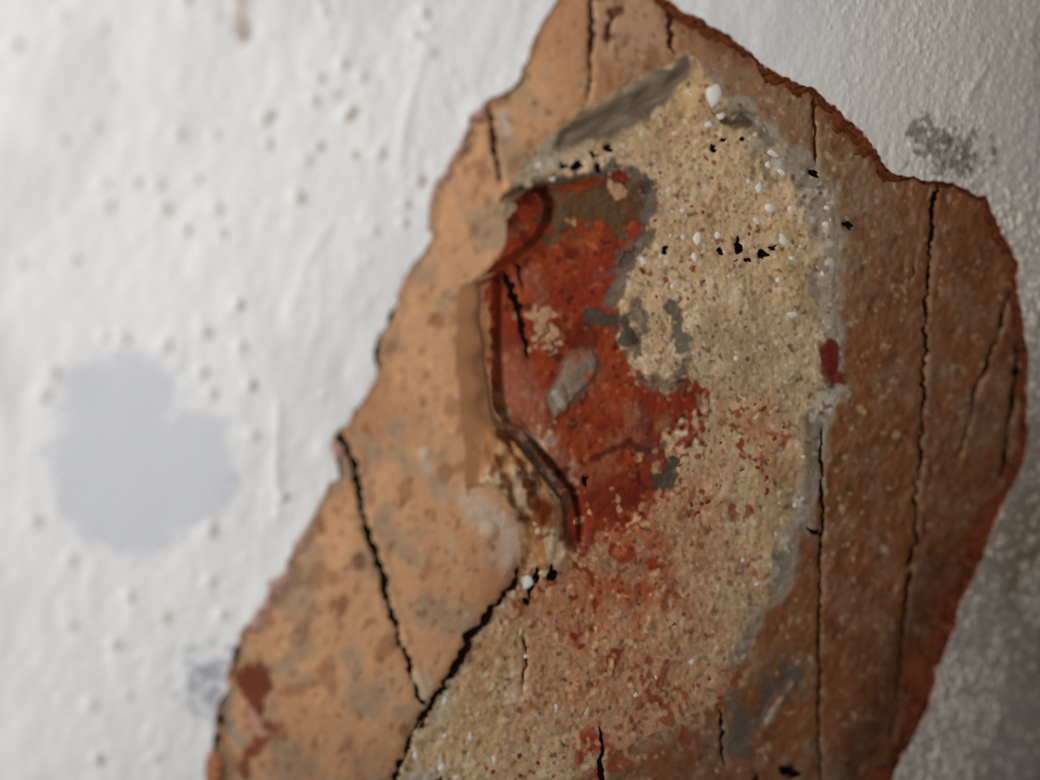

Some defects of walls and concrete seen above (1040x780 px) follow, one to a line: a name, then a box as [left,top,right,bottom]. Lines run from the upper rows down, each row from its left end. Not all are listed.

spalling [205,0,1032,780]
crack [805,426,825,780]
crack [890,184,939,739]
crack [960,289,1020,480]